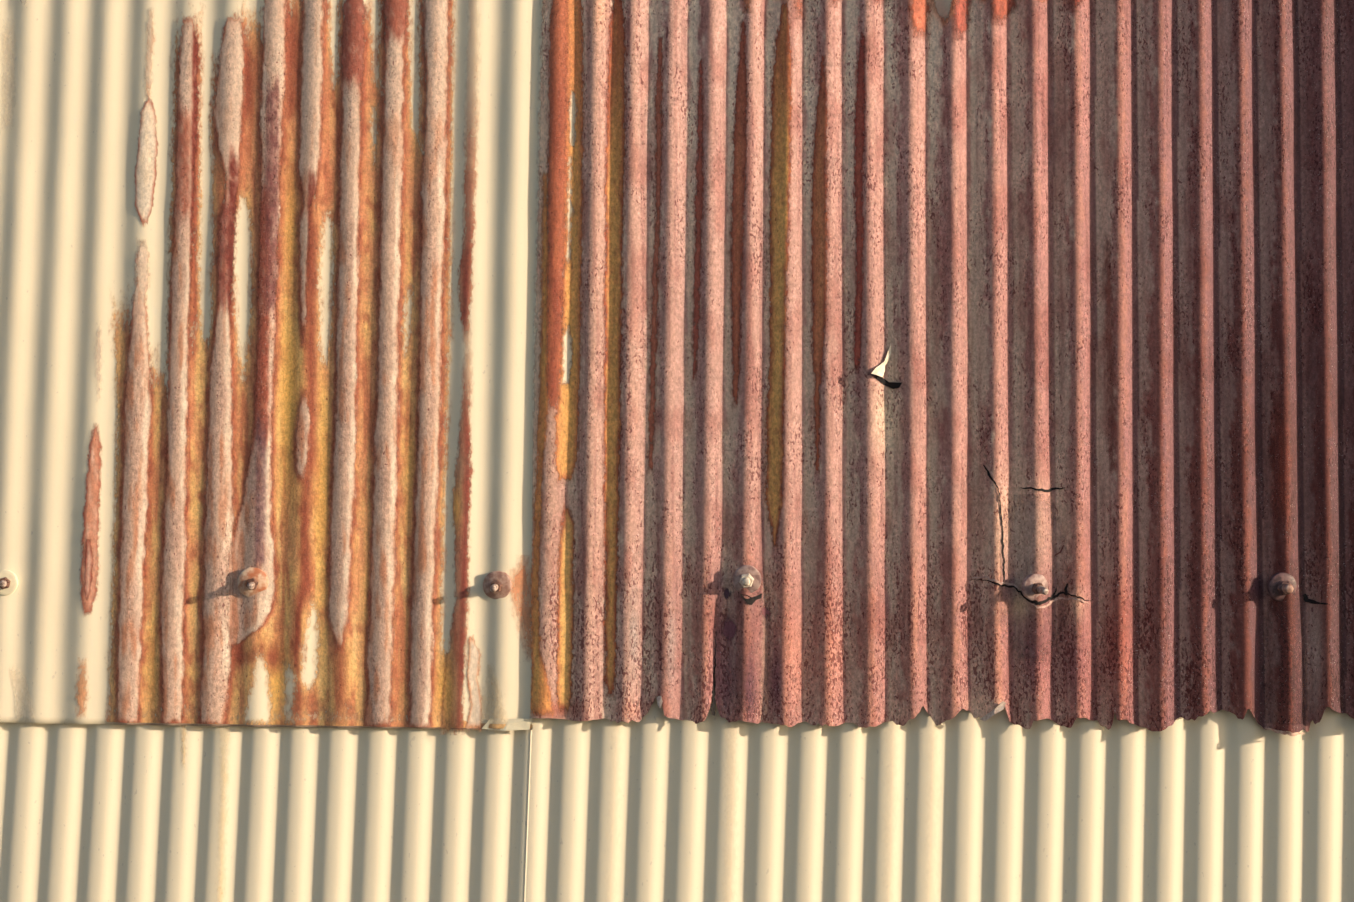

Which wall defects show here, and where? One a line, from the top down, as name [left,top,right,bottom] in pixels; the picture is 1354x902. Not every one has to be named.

corrosion [80,0,506,763]
corrosion [512,0,1354,733]
crack [972,465,1089,609]